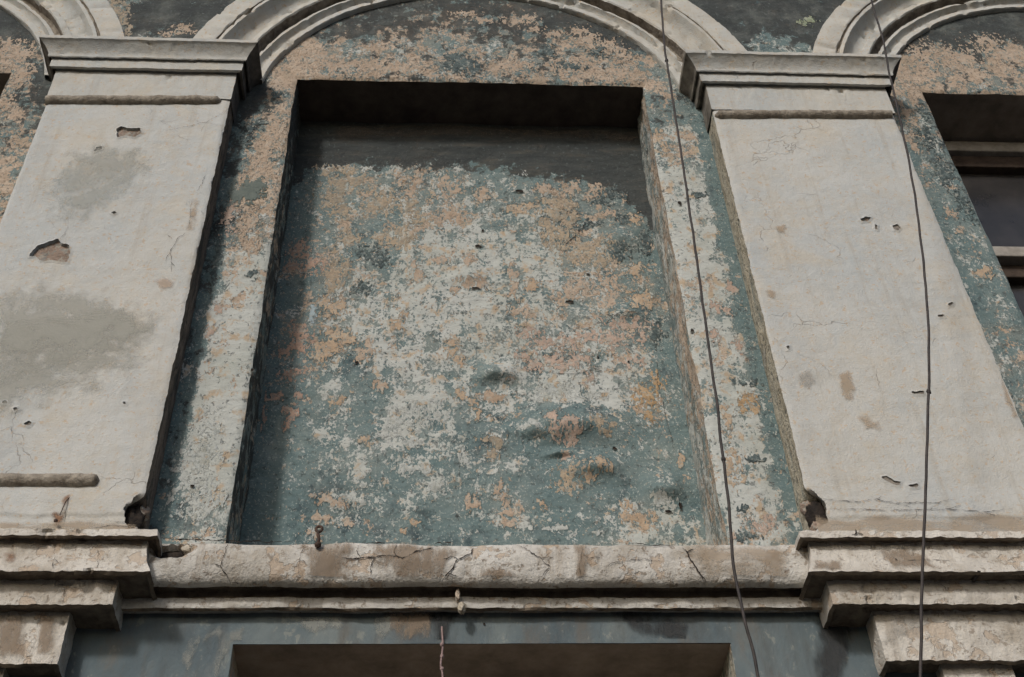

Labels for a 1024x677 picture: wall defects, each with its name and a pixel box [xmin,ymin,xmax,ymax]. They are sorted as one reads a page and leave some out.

peeling [0,35,39,117]
peeling [447,10,651,84]
peeling [896,32,1024,94]
spalling [114,125,144,139]
spalling [27,238,73,265]
peeling [213,195,268,257]
peeling [260,163,669,543]
peeling [165,404,232,527]
spalling [125,505,151,529]
spalling [800,500,828,531]
crack [341,542,473,581]
crack [579,543,706,581]